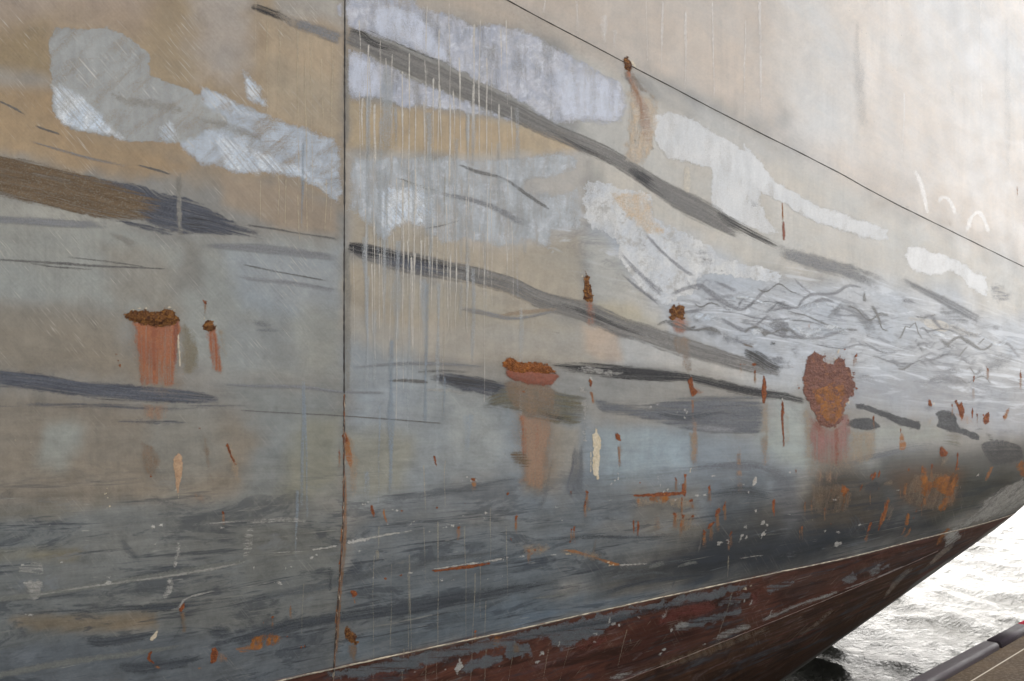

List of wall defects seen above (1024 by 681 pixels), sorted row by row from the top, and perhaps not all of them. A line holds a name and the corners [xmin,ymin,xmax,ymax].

corrosion [617,56,659,166]
corrosion [116,300,228,420]
corrosion [493,353,562,495]
corrosion [580,272,596,327]
corrosion [669,304,702,467]
corrosion [740,341,902,541]
corrosion [335,432,399,662]
peeling [763,567,901,621]